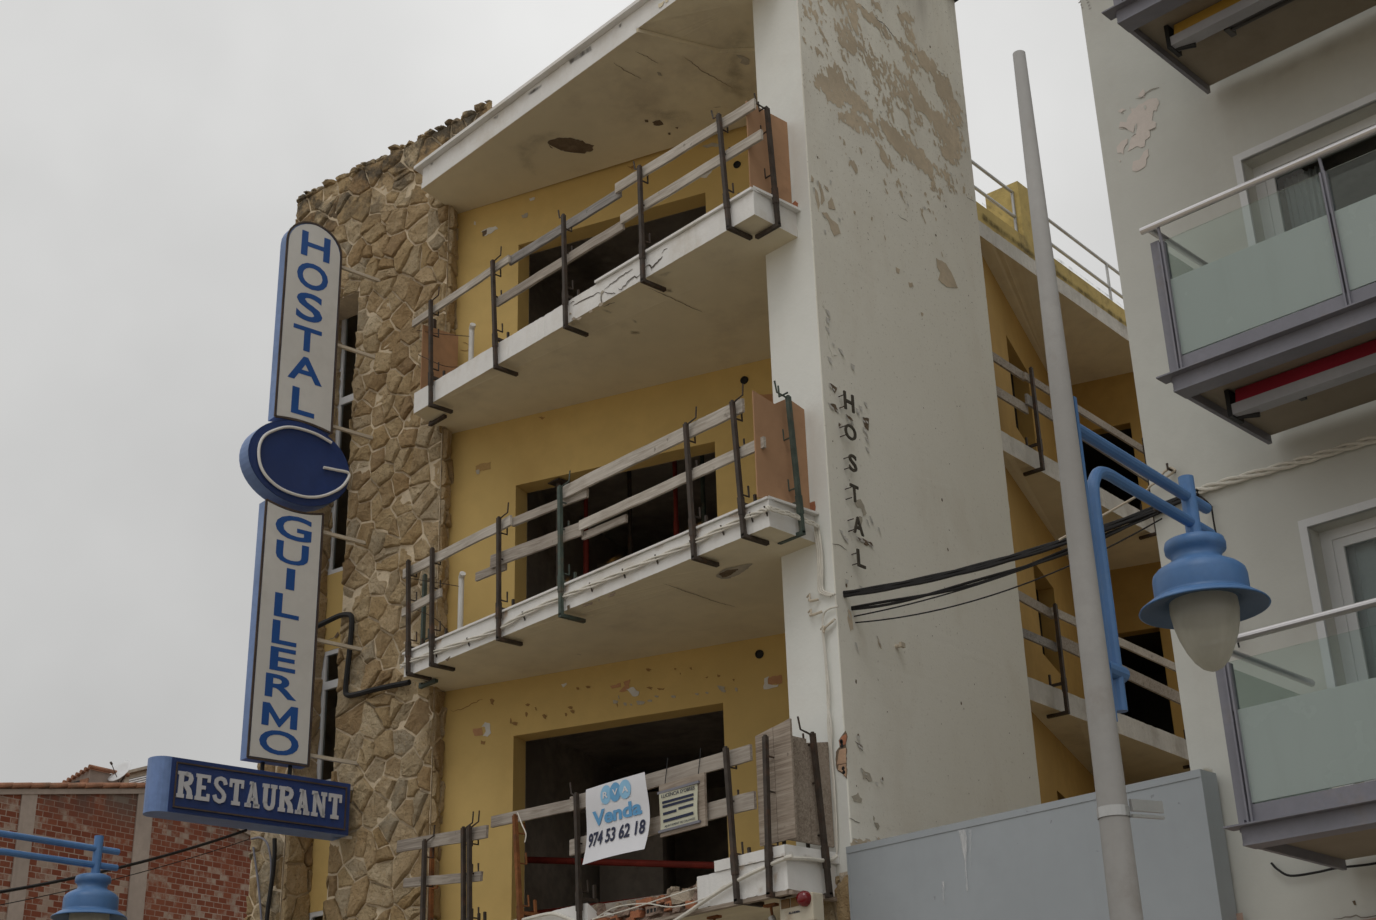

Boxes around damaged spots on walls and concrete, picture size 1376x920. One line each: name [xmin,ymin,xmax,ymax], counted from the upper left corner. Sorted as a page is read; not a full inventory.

flaking render [548,138,594,155]
peeling [801,0,973,296]
peeling [1117,87,1159,171]